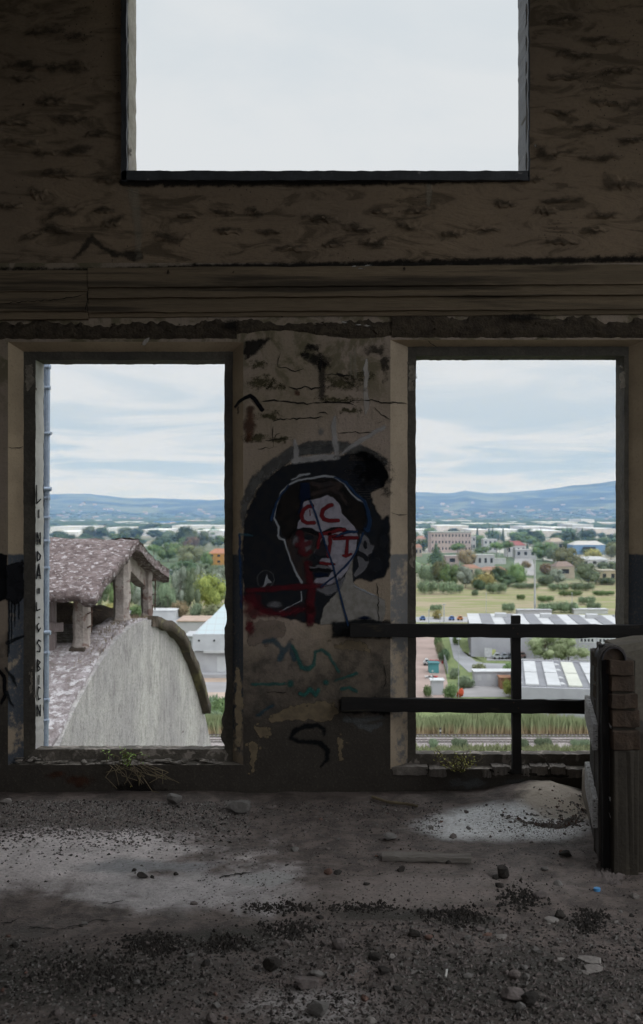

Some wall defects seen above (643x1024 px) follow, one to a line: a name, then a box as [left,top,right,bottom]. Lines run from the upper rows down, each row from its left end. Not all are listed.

spalling [0,315,643,345]
crack [262,356,406,449]
peeling [234,667,339,775]